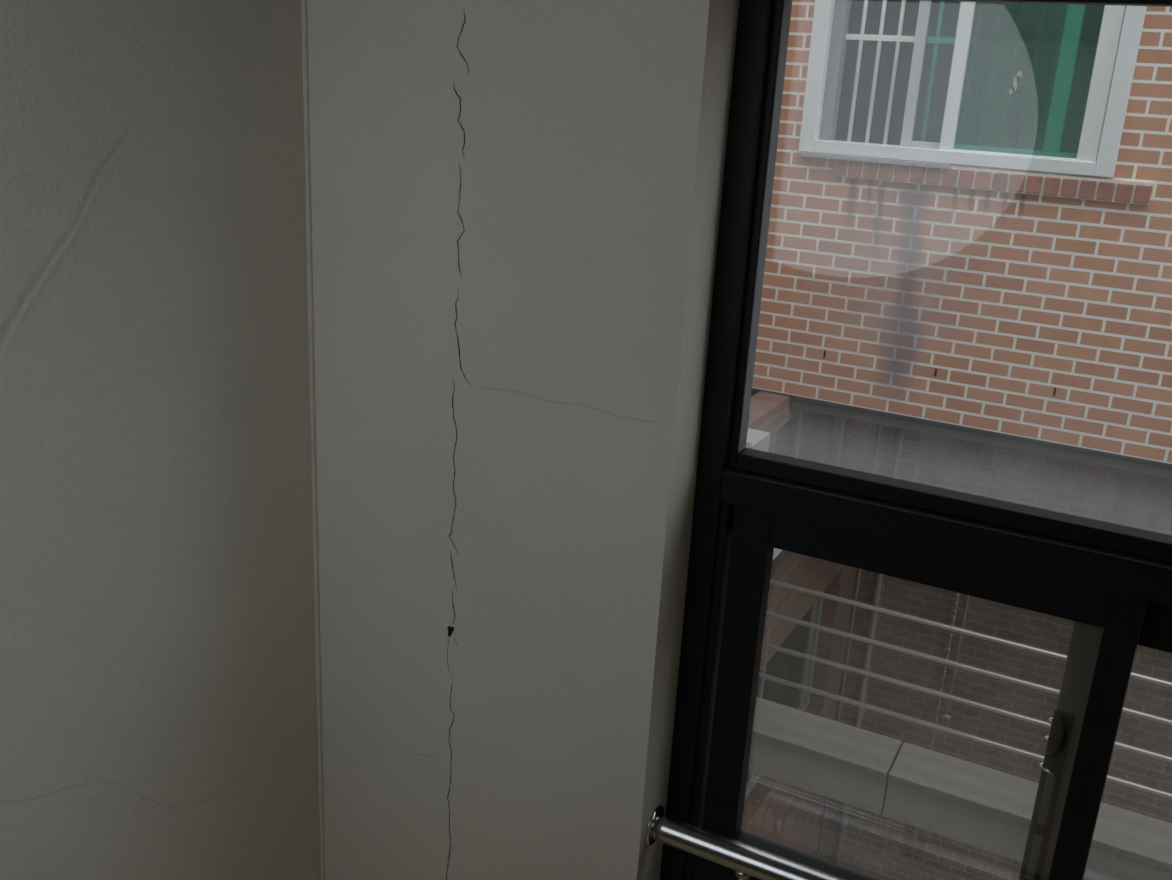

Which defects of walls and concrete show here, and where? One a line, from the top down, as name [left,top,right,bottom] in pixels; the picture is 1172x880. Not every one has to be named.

crack [446,14,471,880]